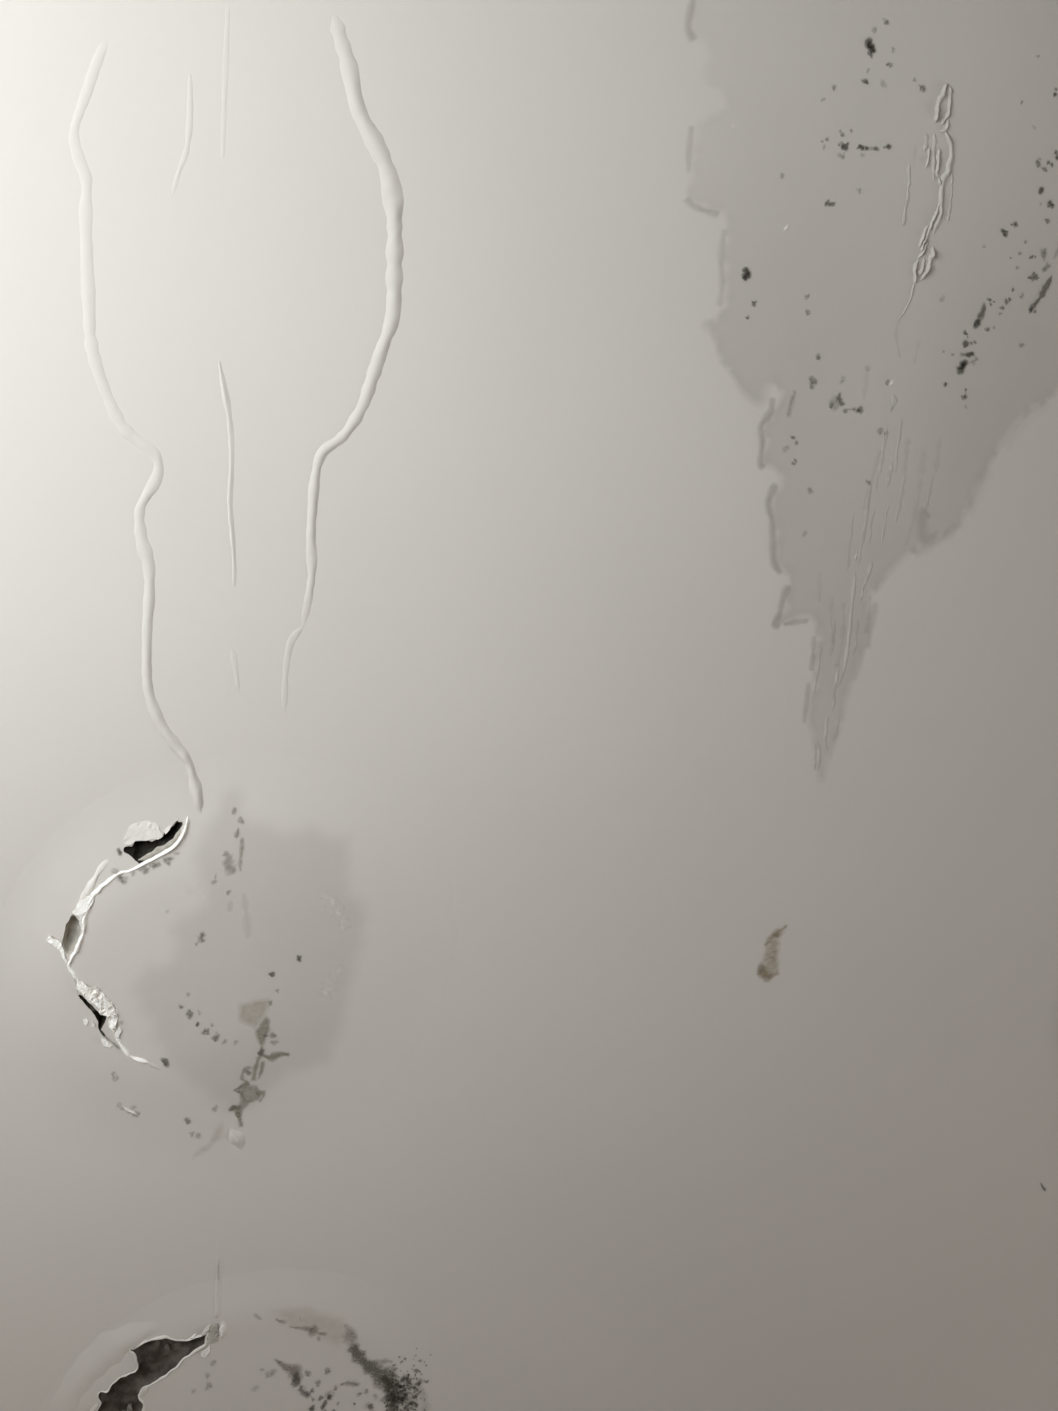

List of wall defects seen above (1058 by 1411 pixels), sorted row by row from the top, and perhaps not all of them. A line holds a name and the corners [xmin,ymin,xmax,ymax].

leakage [1028,251,1051,313]
leakage [945,289,1013,386]
peeling [46,816,189,1070]
leakage [229,1001,289,1151]
spalling [90,1323,223,1411]
mould [278,1345,428,1411]